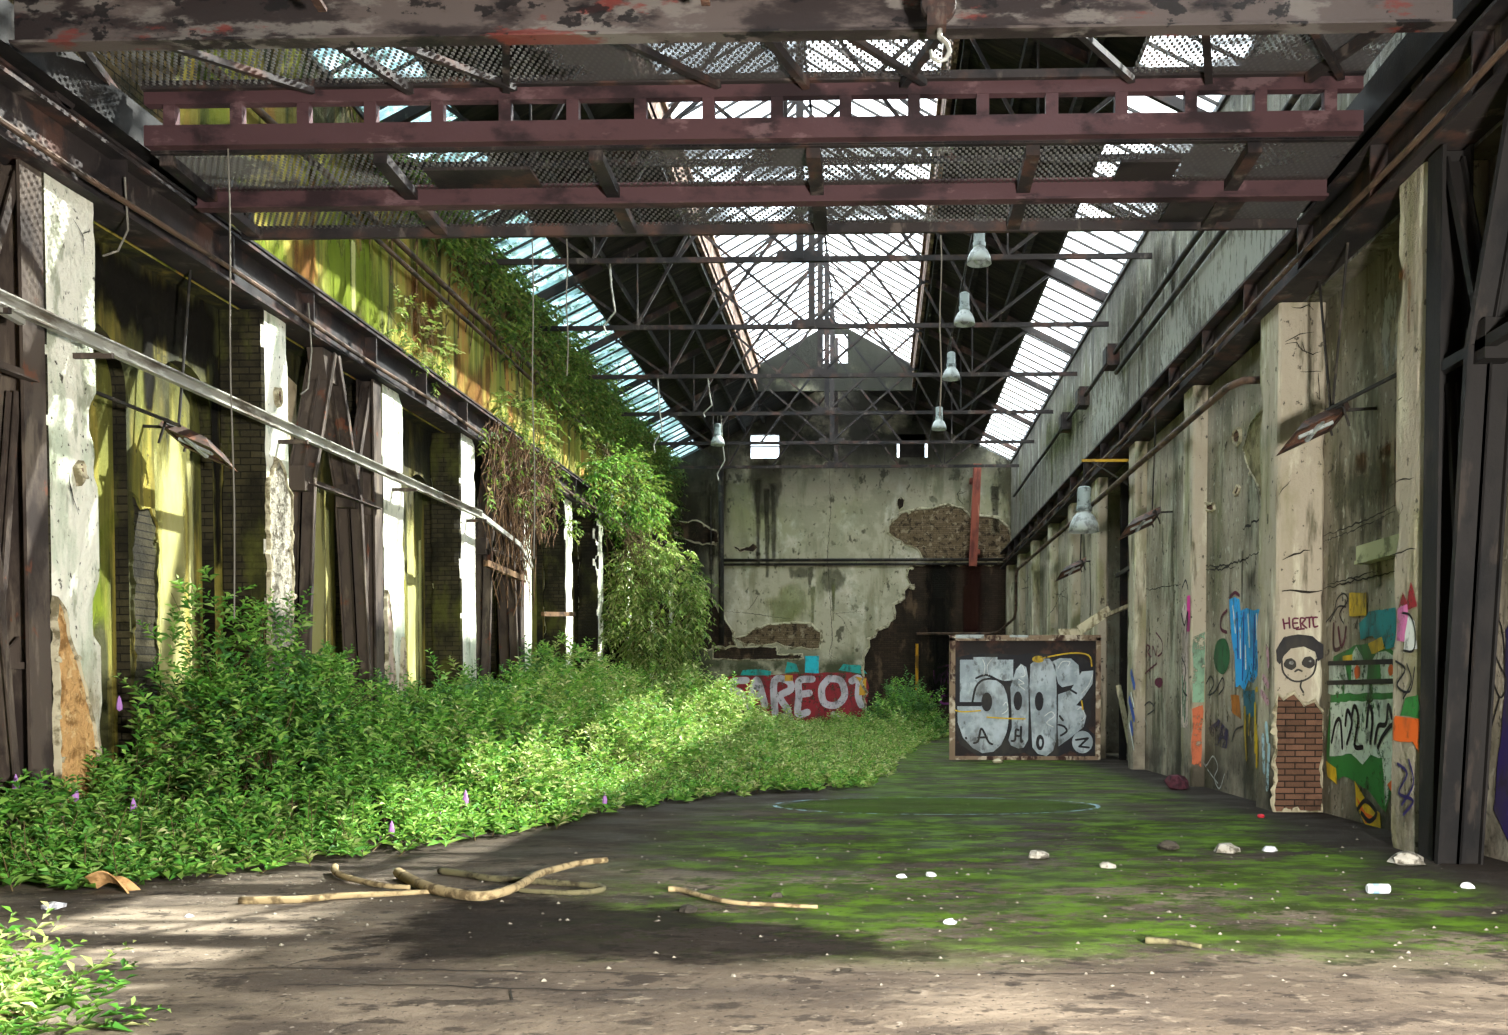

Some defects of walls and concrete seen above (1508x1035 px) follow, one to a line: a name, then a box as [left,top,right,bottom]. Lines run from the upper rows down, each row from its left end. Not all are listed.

water stain [750,460,782,577]
spalling [128,491,161,717]
spalling [672,565,823,661]
water stain [789,567,845,623]
spalling [859,497,1011,730]
spalling [50,595,109,827]
spalling [1270,690,1324,812]